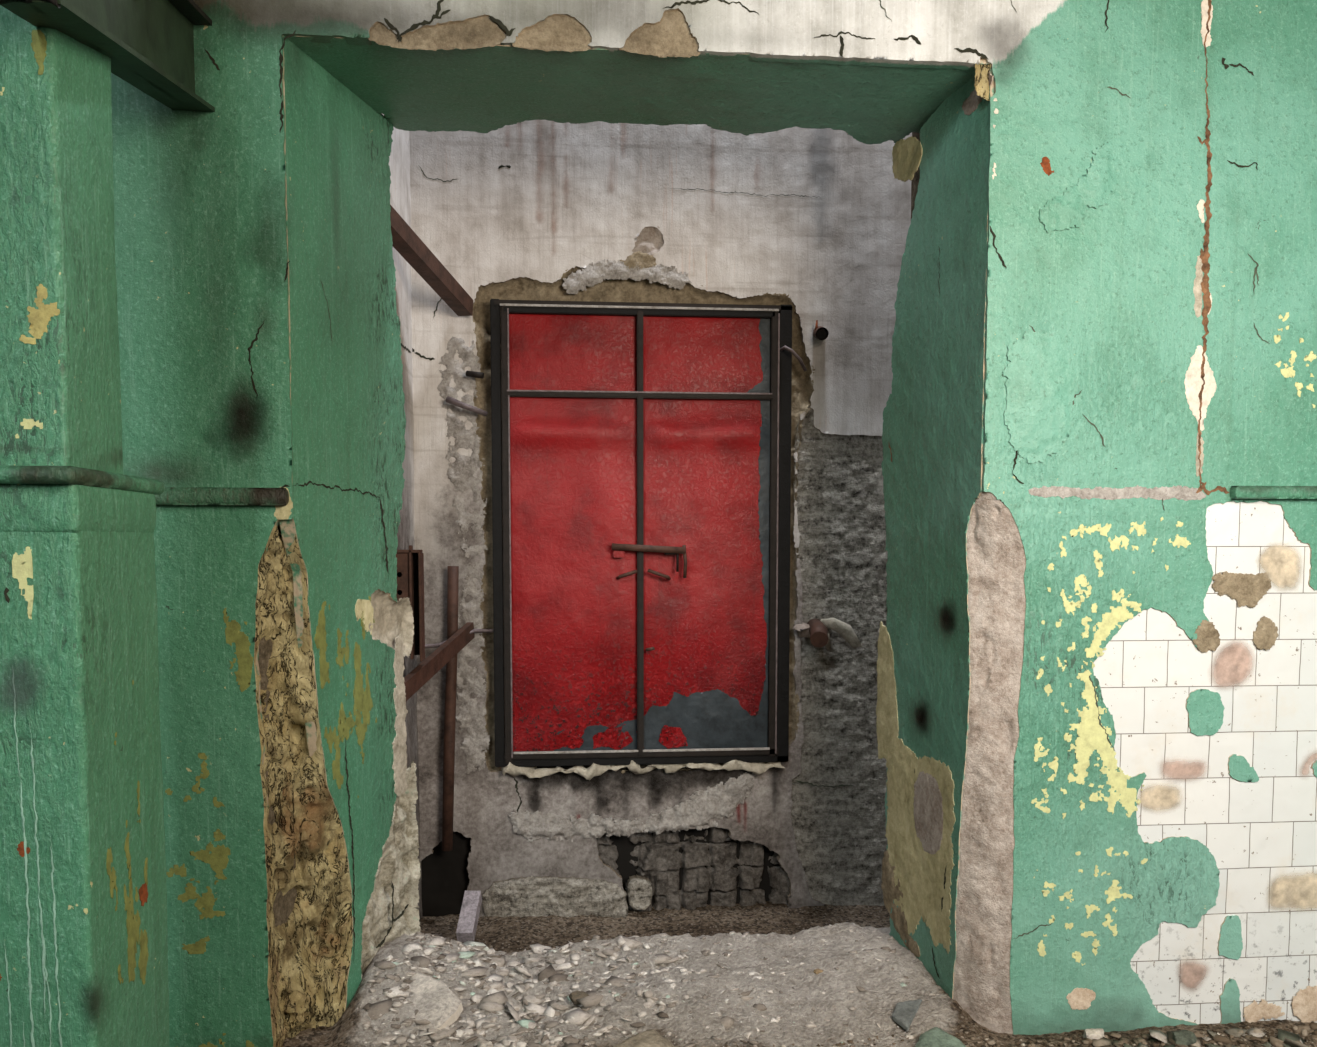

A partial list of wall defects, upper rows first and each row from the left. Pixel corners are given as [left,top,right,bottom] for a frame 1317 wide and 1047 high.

spalling [368,15,592,53]
spalling [619,9,700,58]
crack [814,0,921,57]
crack [954,48,989,60]
crack [1184,0,1259,495]
crack [281,481,388,572]
peeling [437,226,1317,1034]
peeling [165,753,226,808]
spalling [223,487,421,1047]
peeling [166,829,231,920]
peeling [182,936,210,954]